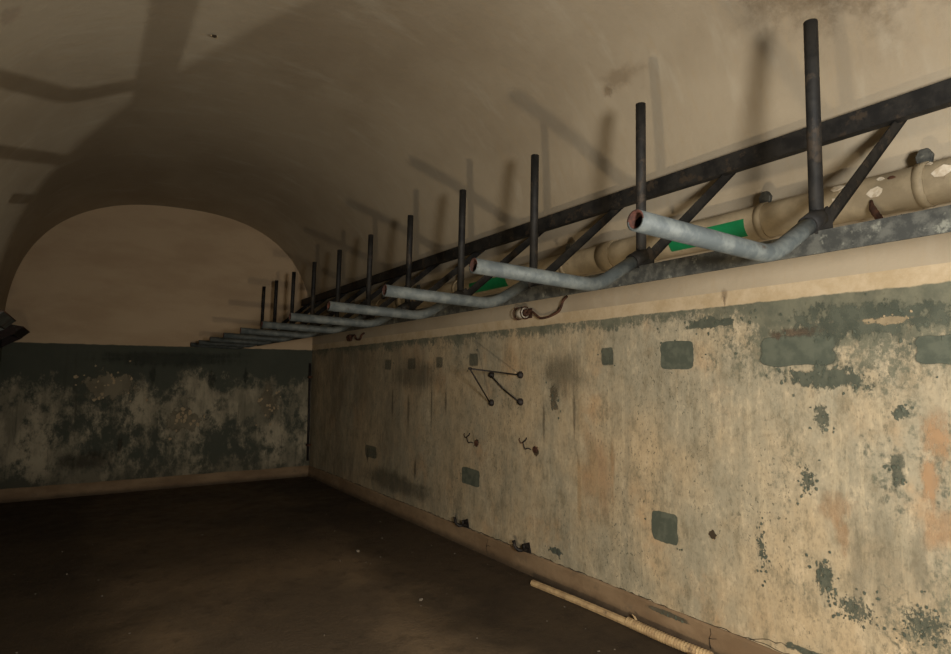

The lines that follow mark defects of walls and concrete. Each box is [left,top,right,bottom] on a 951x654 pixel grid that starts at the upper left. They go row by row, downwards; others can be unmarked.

peeling [774,293,951,346]